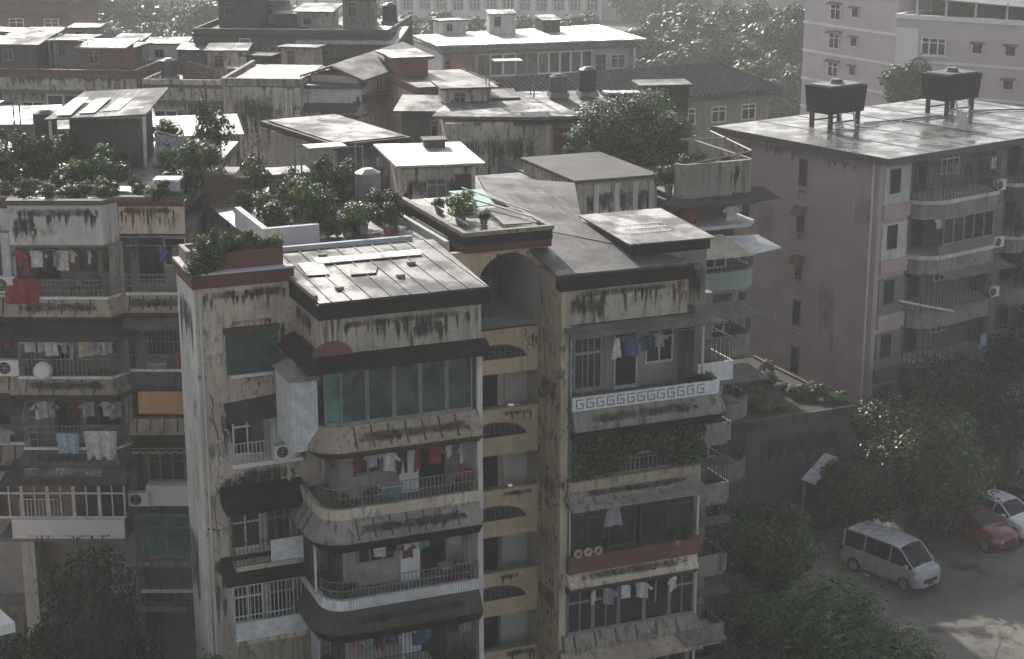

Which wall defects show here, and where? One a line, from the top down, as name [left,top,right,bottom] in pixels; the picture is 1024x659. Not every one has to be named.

damp [467,138,534,163]
damp [0,209,97,239]
damp [203,287,285,308]
damp [571,269,702,318]
damp [344,311,476,342]
crack [208,395,230,610]